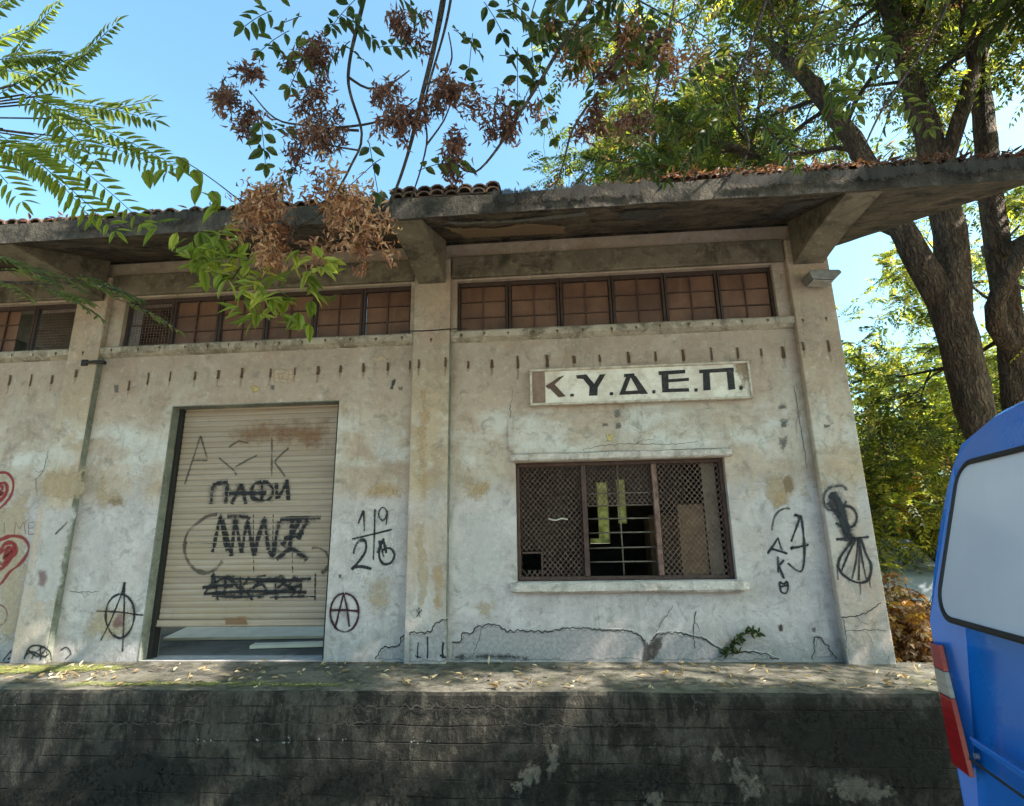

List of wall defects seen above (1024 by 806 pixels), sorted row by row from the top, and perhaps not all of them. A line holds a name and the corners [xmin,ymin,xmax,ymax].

flaking render [375,529,779,662]
crack [656,607,700,647]
crack [841,603,884,652]
leakage [236,759,455,806]
leakage [514,741,569,804]